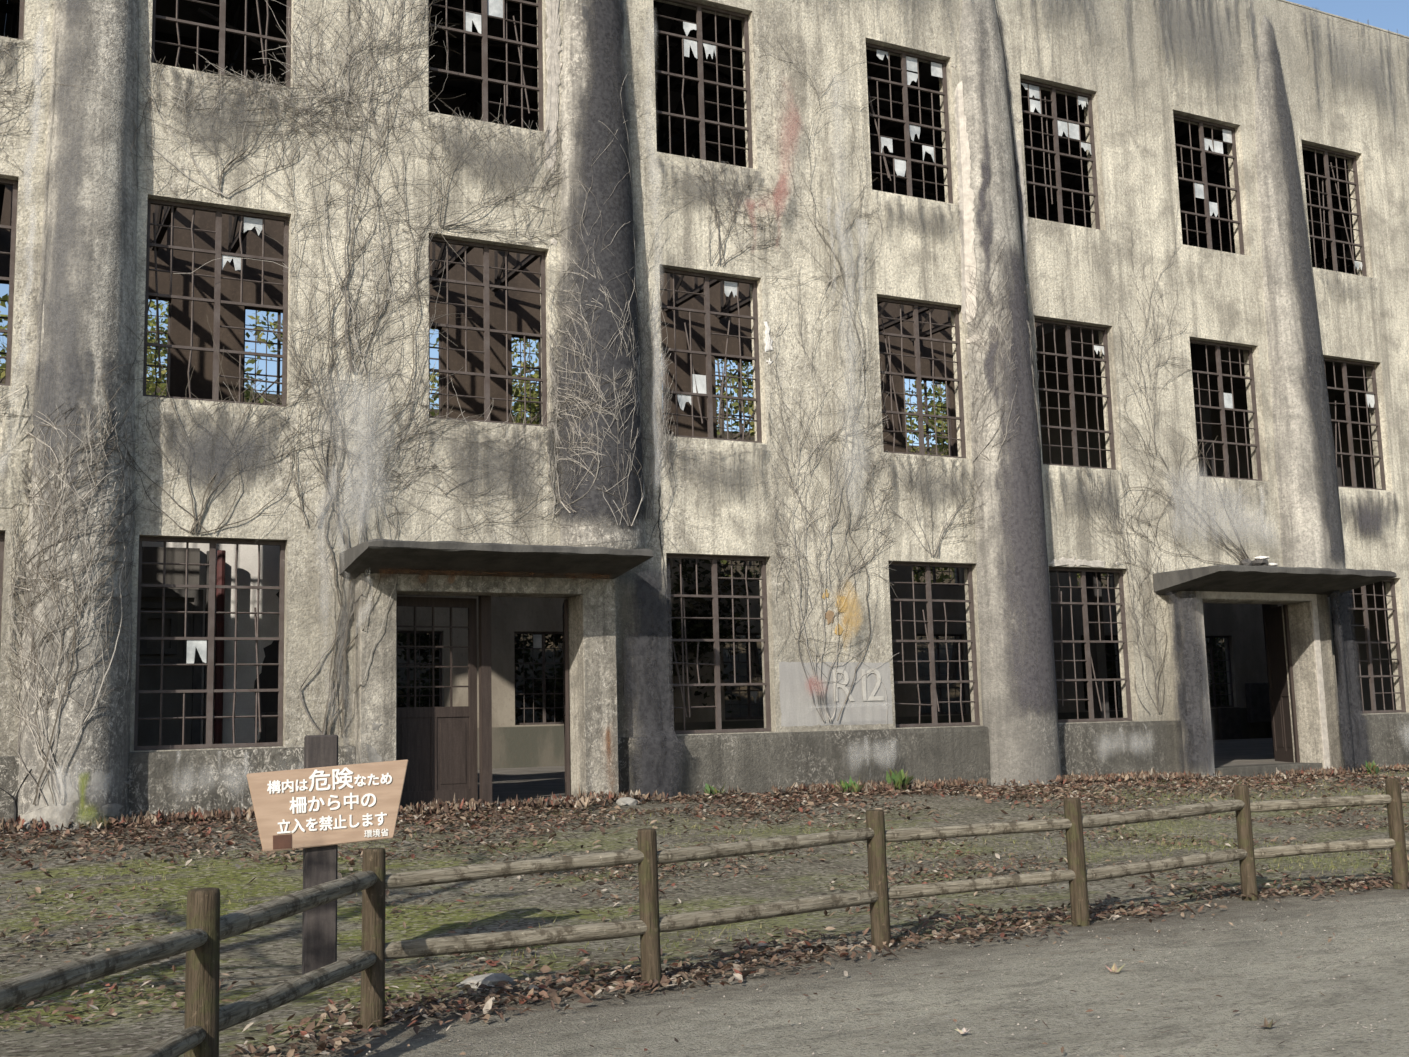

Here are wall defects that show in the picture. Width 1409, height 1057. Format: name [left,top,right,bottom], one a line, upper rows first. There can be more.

leakage [35,49,115,475]
leakage [167,400,282,484]
leakage [537,0,645,527]
leakage [976,0,1116,713]
leakage [1159,0,1398,562]